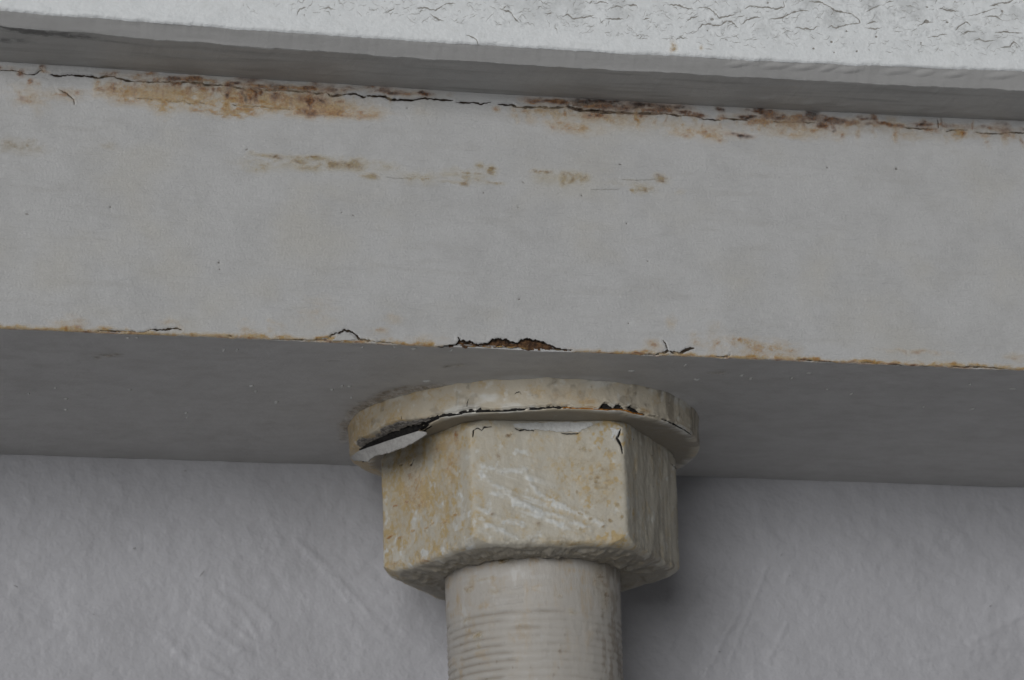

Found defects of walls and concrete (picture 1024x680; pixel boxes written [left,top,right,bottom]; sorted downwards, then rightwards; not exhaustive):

crack [247,0,1023,55]
corrosion [97,72,367,118]
crack [0,70,814,124]
corrosion [524,98,720,141]
corrosion [731,108,903,138]
corrosion [0,324,365,343]
crack [285,329,394,344]
spalling [437,337,571,351]
crack [648,340,730,357]
corrosion [575,338,1024,370]
crack [356,392,691,462]
peeling [350,431,427,462]